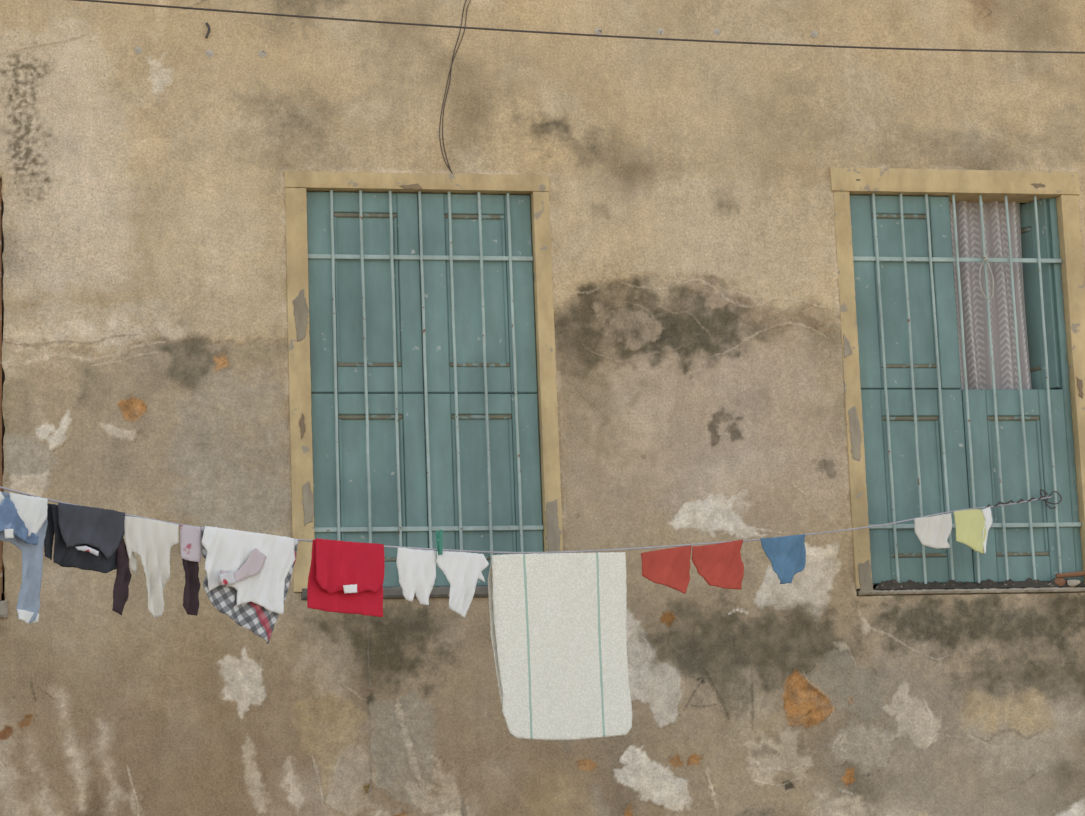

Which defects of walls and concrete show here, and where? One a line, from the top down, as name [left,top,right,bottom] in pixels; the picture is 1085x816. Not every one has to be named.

flaking render [3,409,74,498]
spalling [95,393,149,442]
leakage [553,261,847,487]
peeling [804,542,823,564]
flaking render [738,644,1085,816]
flaking render [612,743,706,816]